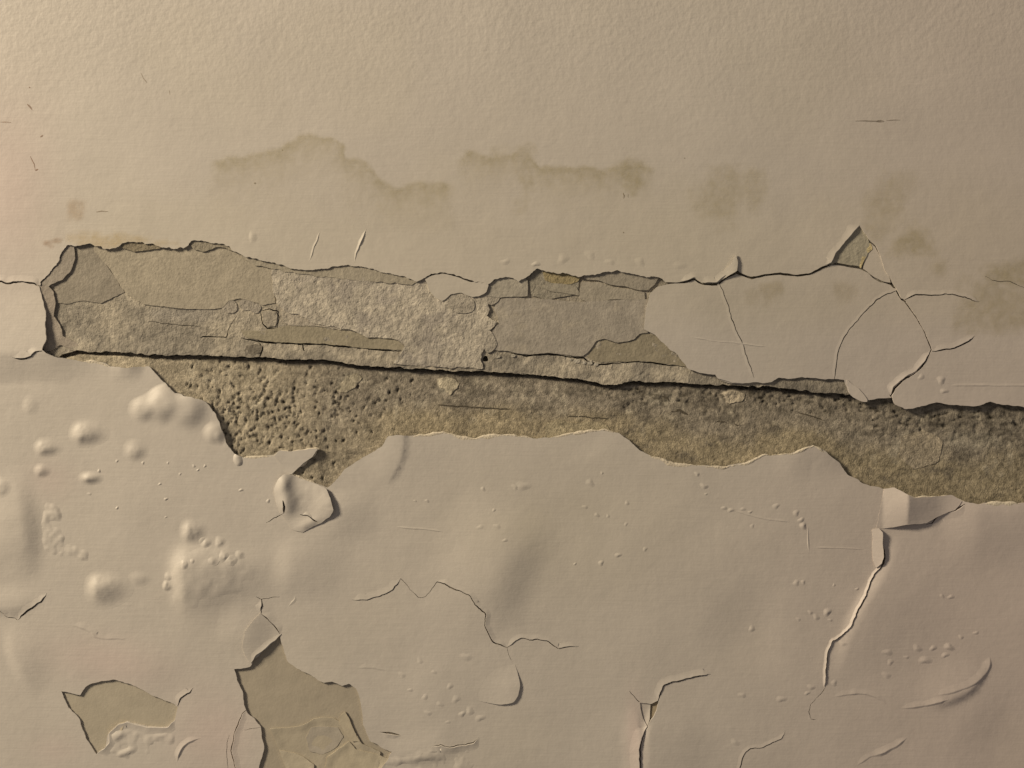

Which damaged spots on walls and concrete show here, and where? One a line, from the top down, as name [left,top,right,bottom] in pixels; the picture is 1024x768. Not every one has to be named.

spalling [826,226,891,307]
crack [678,264,832,378]
crack [832,280,1010,396]
spalling [36,240,1024,568]
crack [926,504,966,529]
crack [352,578,401,600]
crack [420,579,579,649]
crack [823,548,885,689]
spalling [63,680,186,759]
spalling [227,613,474,768]
crack [629,726,648,768]
crack [630,669,711,700]